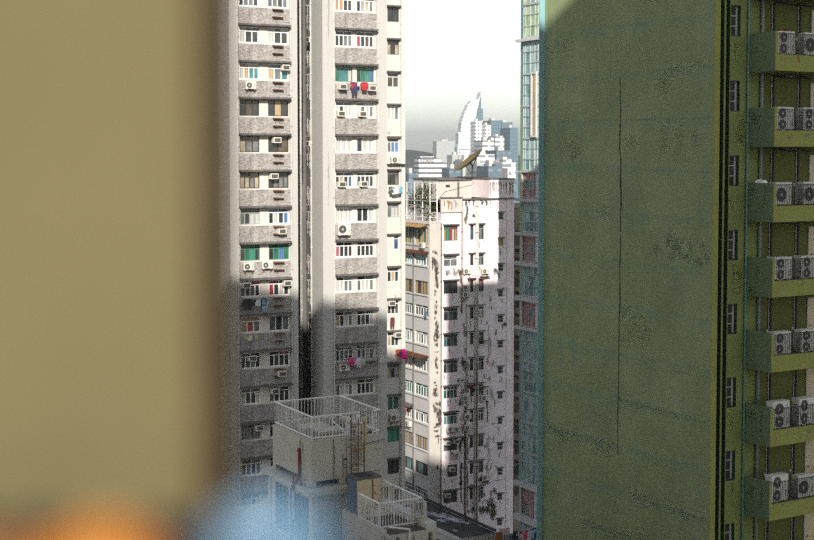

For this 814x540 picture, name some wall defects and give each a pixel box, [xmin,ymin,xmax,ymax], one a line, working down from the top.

leakage [432,243,490,443]
leakage [464,182,507,223]
crack [615,83,623,449]
leakage [408,436,500,532]